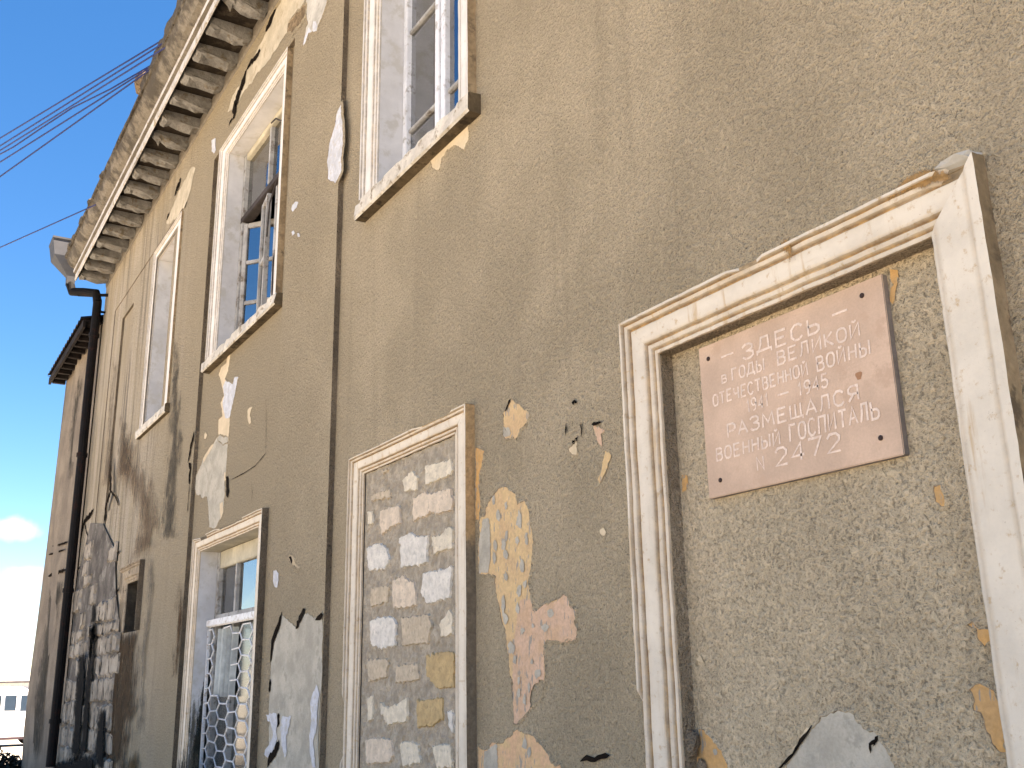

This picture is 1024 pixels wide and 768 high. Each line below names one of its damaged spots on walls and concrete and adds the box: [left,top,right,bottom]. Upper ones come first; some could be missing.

peeling [326,100,345,187]
peeling [430,125,471,173]
leakage [105,345,182,555]
crack [186,432,194,511]
peeling [204,354,240,446]
peeling [502,396,532,444]
peeling [593,426,611,483]
crack [48,461,119,577]
peeling [474,445,580,768]
peeling [264,713,291,758]
peeling [309,684,319,768]
peeling [966,678,1007,759]